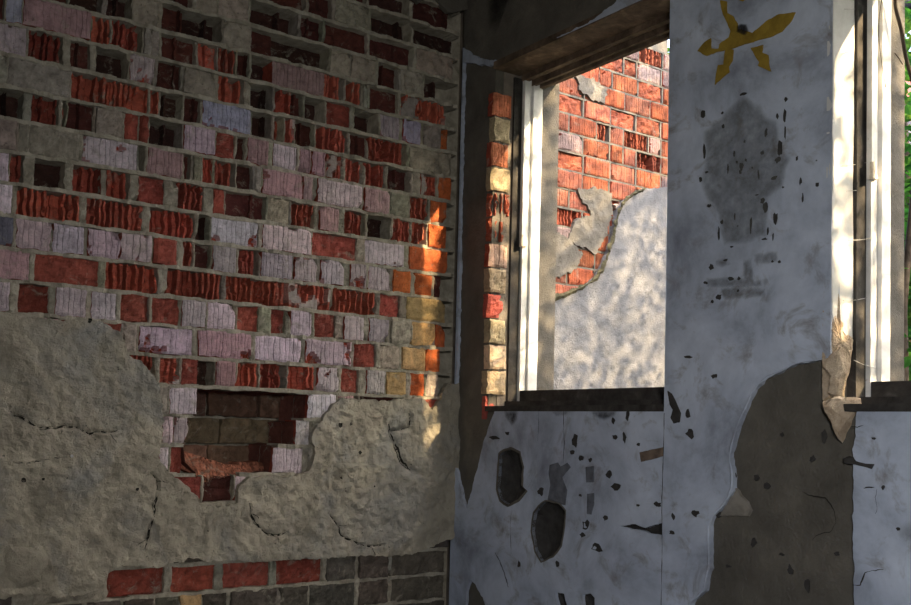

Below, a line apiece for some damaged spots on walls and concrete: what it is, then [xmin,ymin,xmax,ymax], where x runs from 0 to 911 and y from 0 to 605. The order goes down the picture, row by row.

flaking render [555,47,669,301]
flaking render [0,0,616,506]
flaking render [0,540,449,605]
spalling [496,447,566,567]
flaking render [636,443,663,462]
spalling [624,513,675,535]
flaking render [667,391,690,423]
flaking render [689,294,874,605]